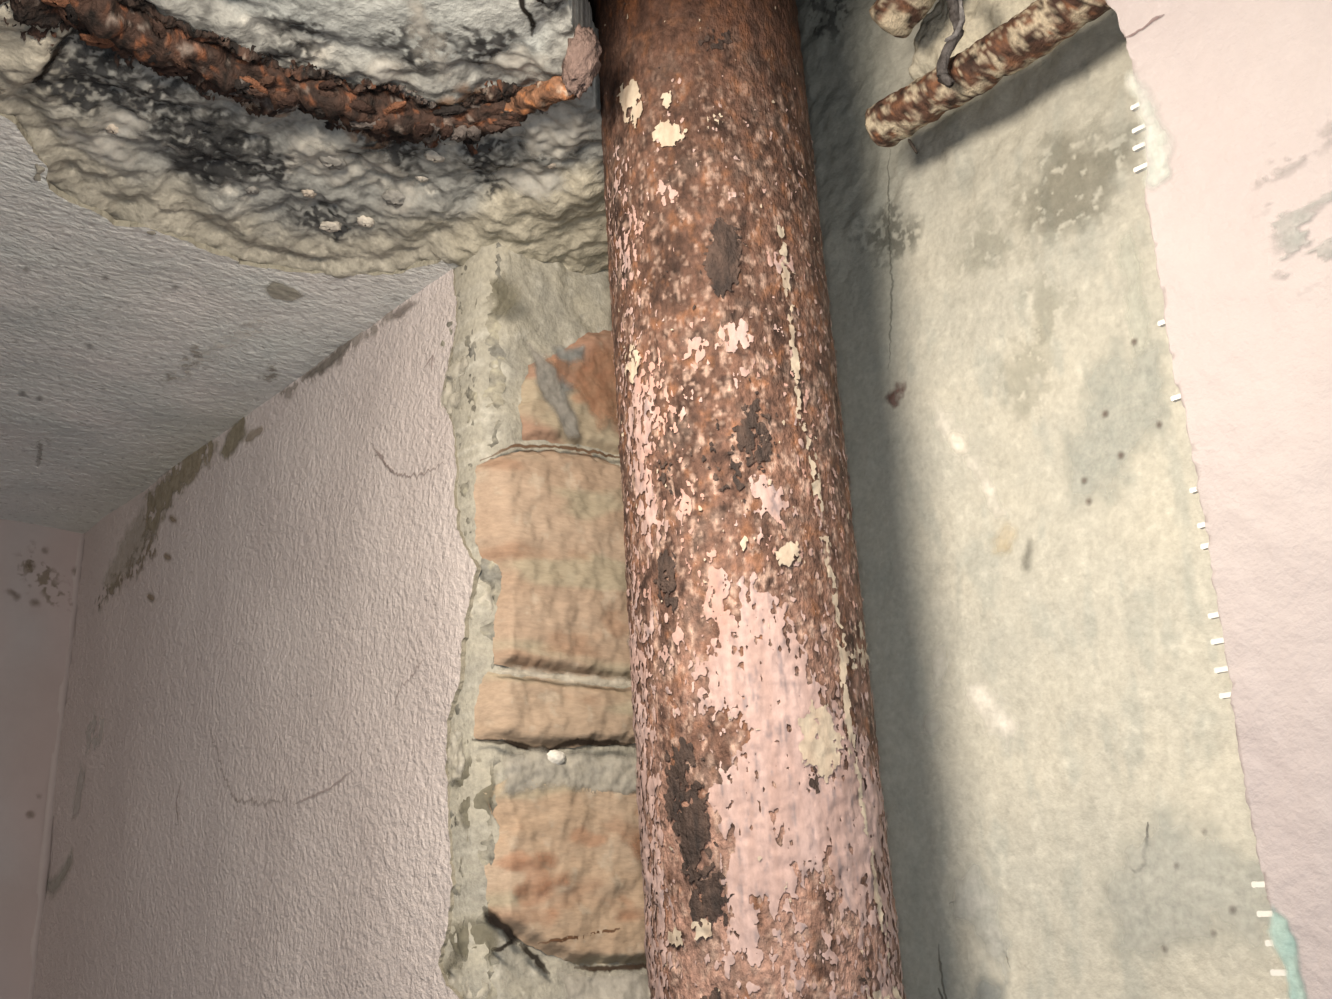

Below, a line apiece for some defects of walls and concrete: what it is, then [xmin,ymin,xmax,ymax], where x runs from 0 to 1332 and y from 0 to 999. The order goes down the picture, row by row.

corrosion [0,0,602,157]
corrosion [865,0,1111,147]
corrosion [887,387,904,407]
crack [939,957,947,999]
peeling [1269,911,1306,999]